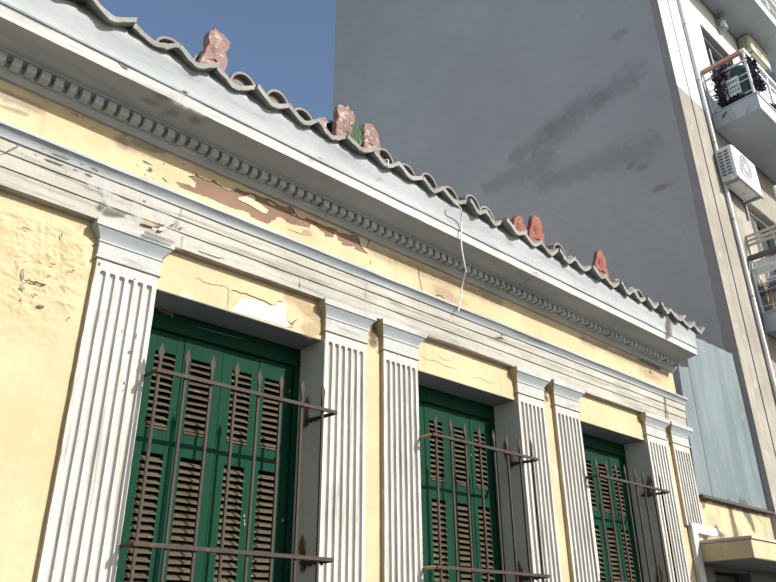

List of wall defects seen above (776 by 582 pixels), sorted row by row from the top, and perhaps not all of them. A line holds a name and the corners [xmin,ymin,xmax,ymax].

peeling [136,160,368,254]
peeling [228,289,298,328]